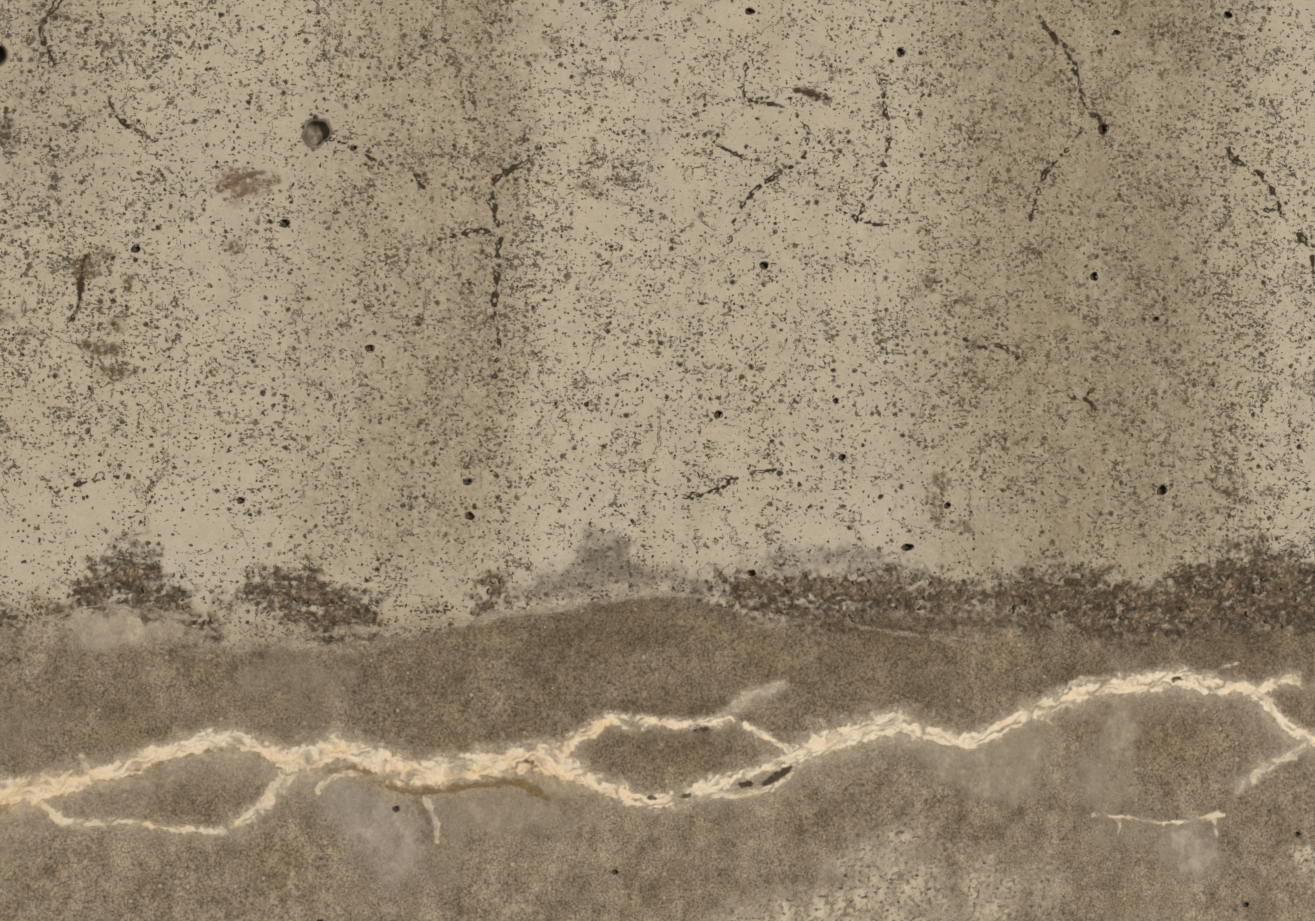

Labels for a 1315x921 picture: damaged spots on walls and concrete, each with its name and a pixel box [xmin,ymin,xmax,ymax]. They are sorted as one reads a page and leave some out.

crack [38,0,62,87]
crack [1029,0,1103,222]
crack [452,146,542,379]
spalling [45,534,381,644]
spalling [471,570,517,621]
spalling [692,535,1315,646]
crack [0,662,1315,878]
water stain [923,728,1048,805]
water stain [1069,692,1138,818]
water stain [326,777,560,883]